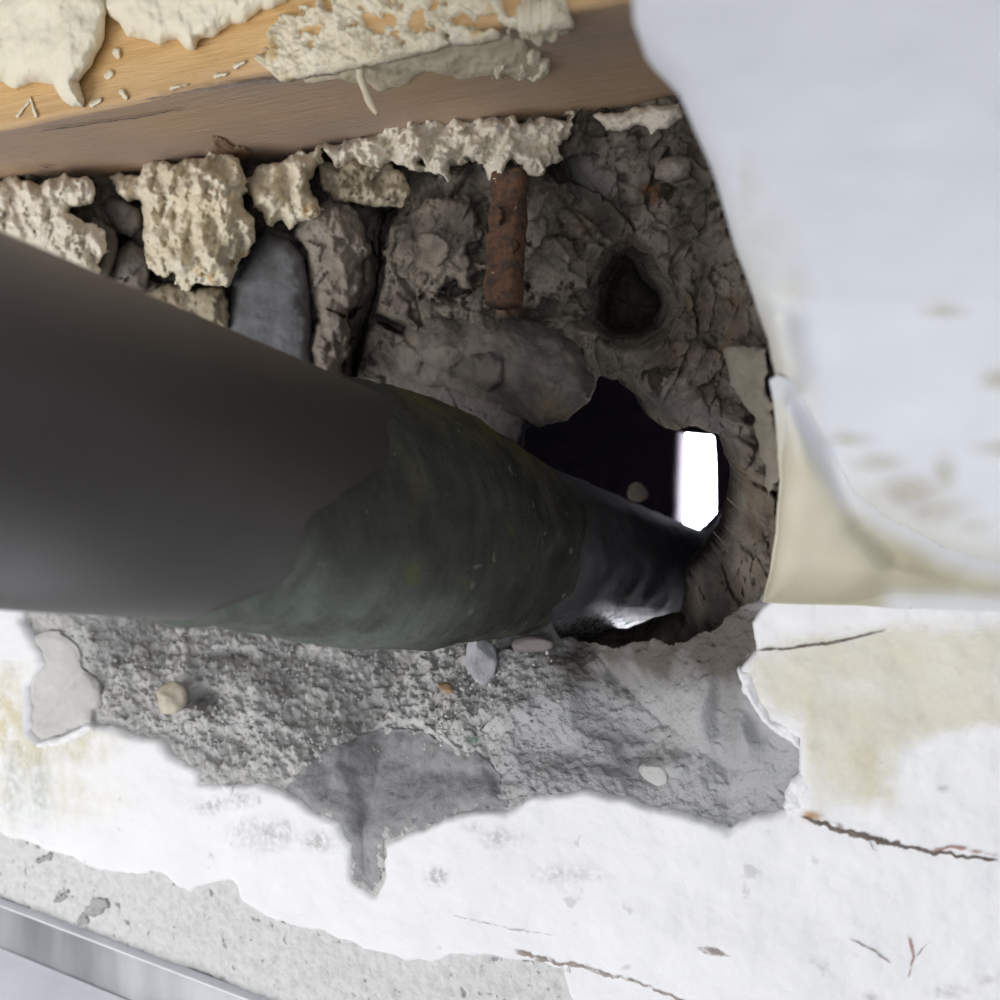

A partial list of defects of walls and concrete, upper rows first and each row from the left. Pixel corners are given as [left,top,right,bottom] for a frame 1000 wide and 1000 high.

corrosion [483,167,529,311]
spalling [593,242,681,344]
spalling [627,482,648,502]
crack [745,630,883,659]
spalling [26,594,808,896]
leakage [763,633,1000,794]
crack [803,813,996,862]
crack [472,920,681,1000]